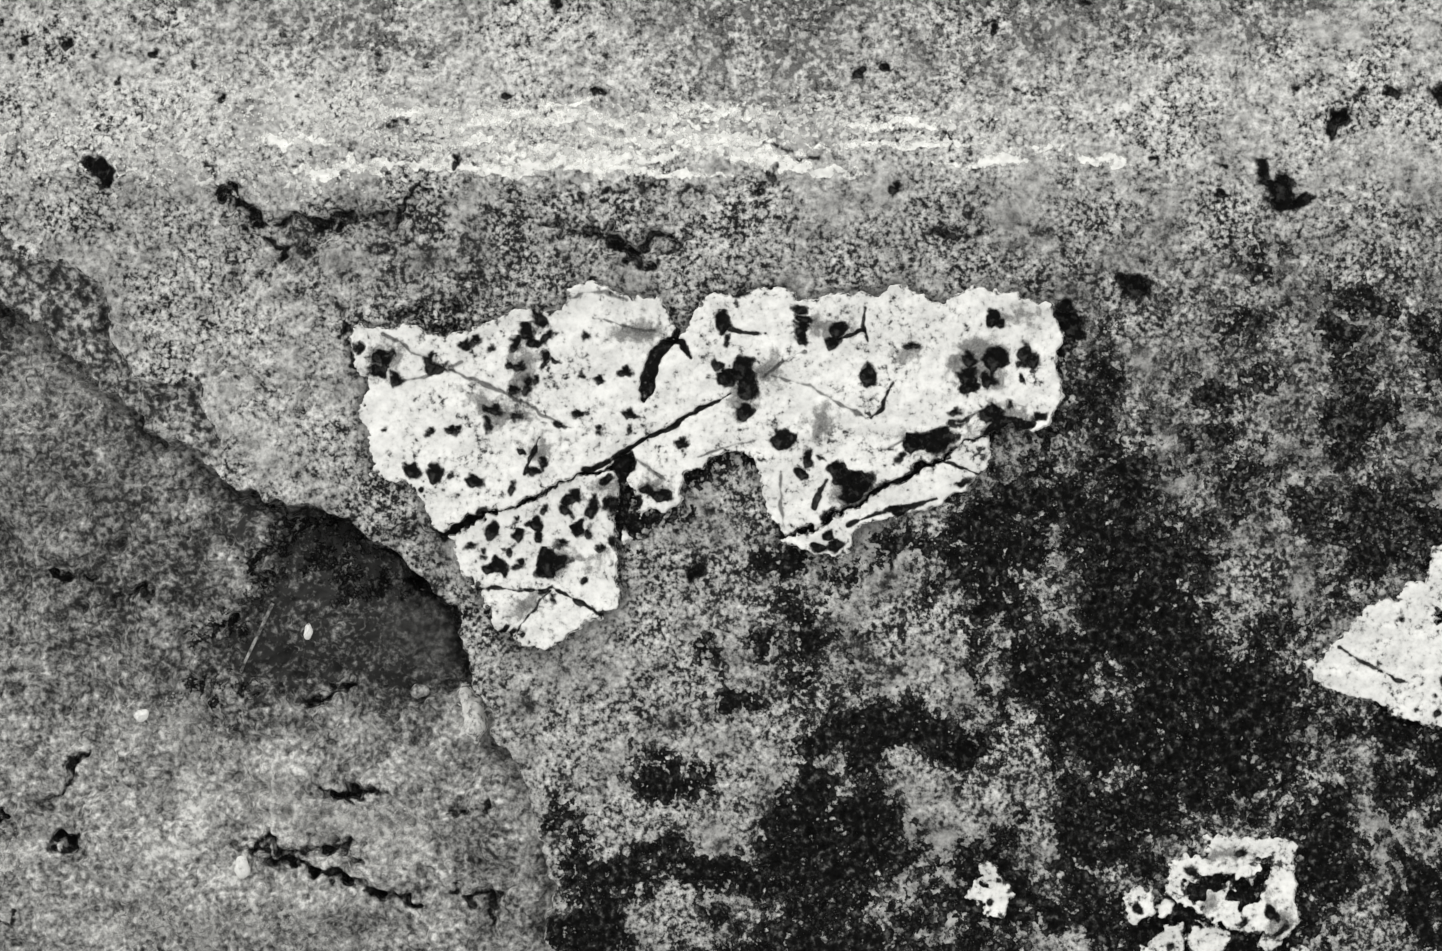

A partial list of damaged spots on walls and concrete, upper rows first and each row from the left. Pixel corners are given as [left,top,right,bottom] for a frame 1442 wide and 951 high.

crack [332,131,834,542]
damp [614,452,759,560]
flaking render [350,280,1087,651]
crack [728,306,1003,539]
damp [1050,299,1140,457]
damp [1166,231,1442,488]
crack [473,585,603,637]
crack [301,681,358,708]
crack [47,749,103,854]
crack [230,782,504,926]
damp [540,786,601,928]
damp [712,874,954,951]